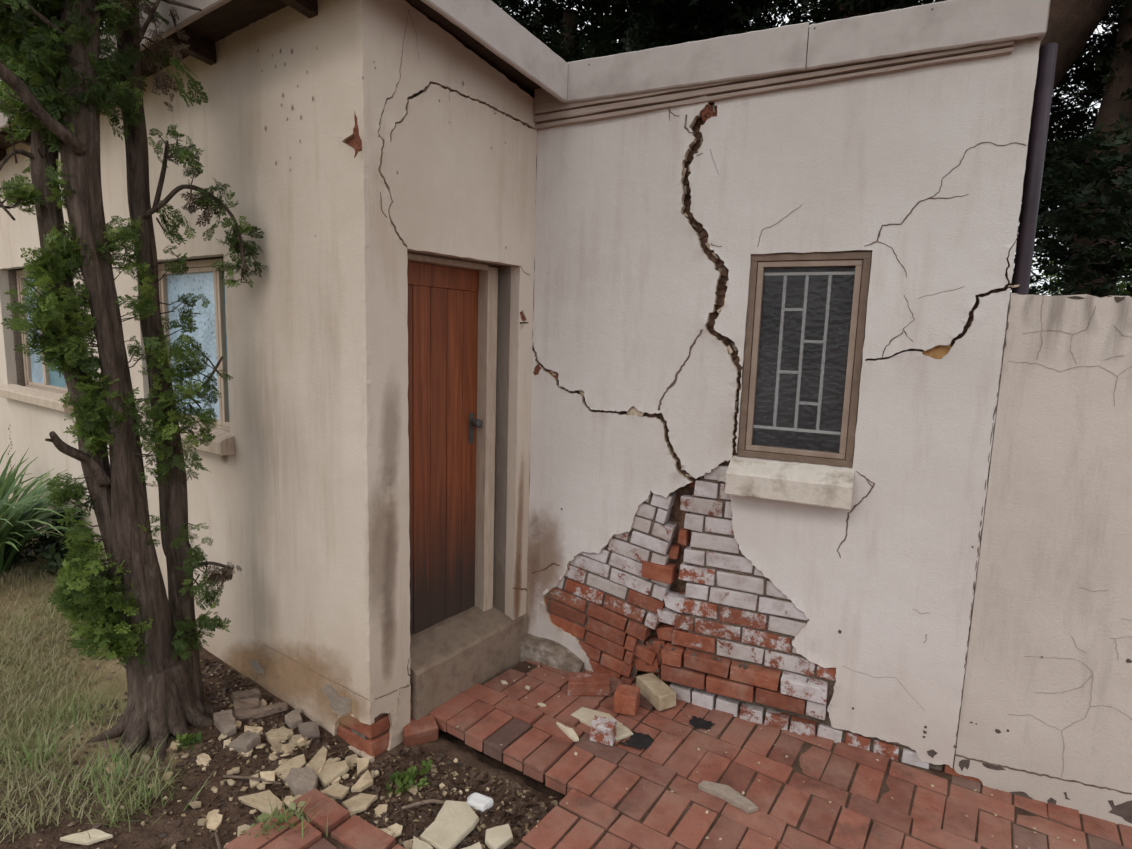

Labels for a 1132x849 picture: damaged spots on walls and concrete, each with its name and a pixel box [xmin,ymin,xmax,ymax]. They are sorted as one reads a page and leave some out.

crack [386,10,529,128]
flaking render [346,114,362,158]
crack [520,102,743,484]
crack [864,142,1132,795]
leakage [232,649,324,696]
flaking render [545,465,1005,785]
flaking render [244,726,307,784]
flaking render [316,713,390,817]
peeling [1108,800,1132,823]